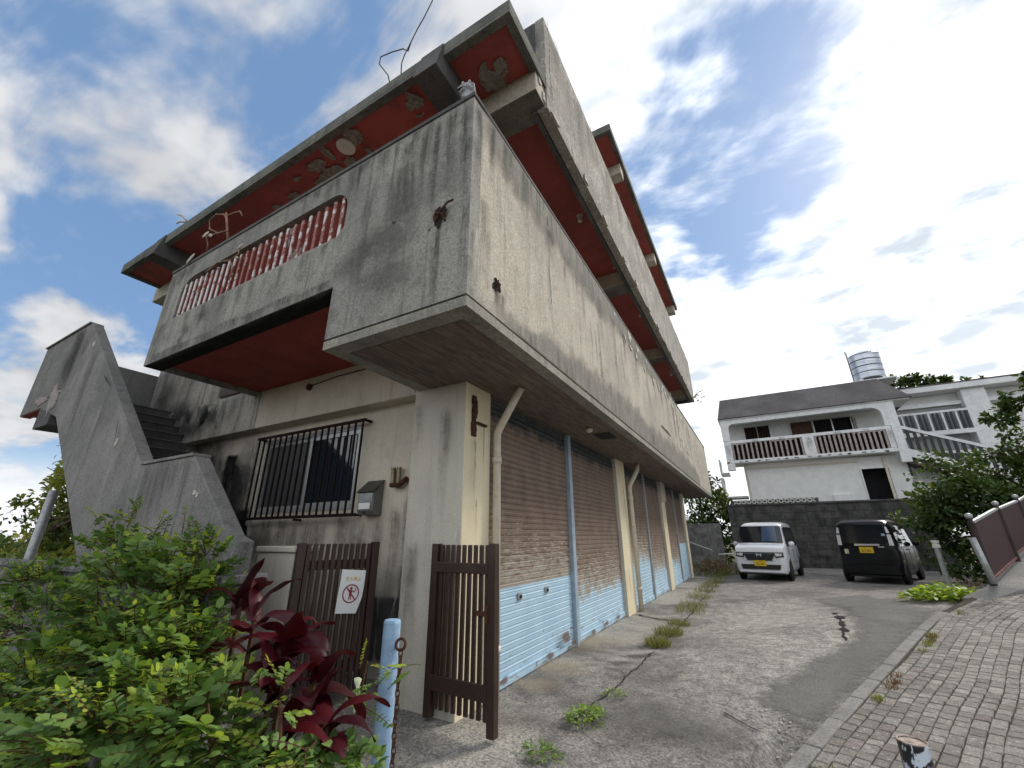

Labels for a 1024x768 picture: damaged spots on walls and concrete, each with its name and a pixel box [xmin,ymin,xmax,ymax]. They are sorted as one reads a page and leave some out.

peeling [478,57,509,93]
peeling [272,129,372,209]
crack [575,584,716,719]